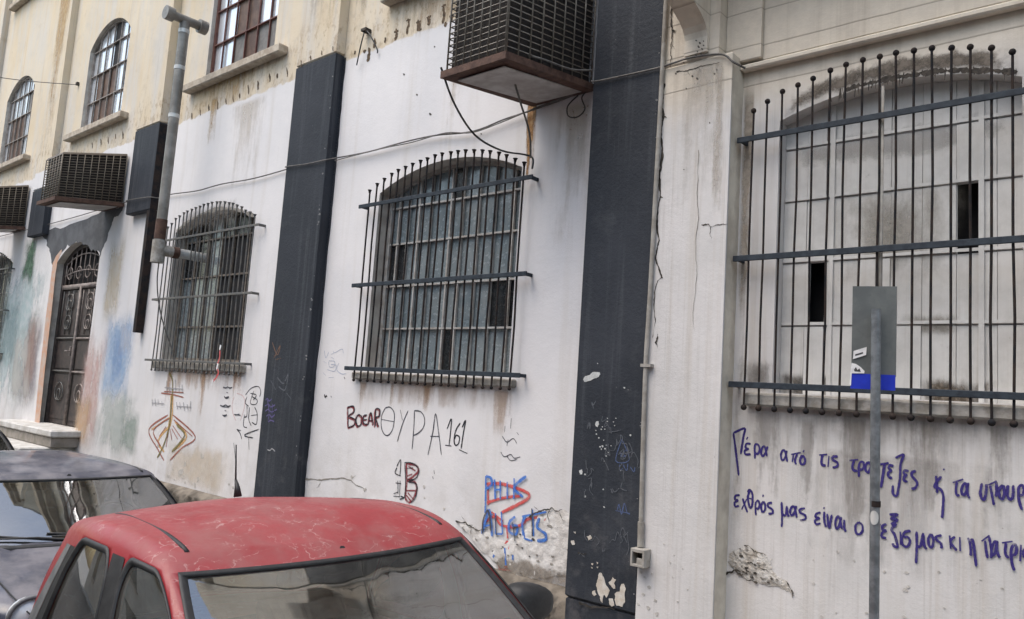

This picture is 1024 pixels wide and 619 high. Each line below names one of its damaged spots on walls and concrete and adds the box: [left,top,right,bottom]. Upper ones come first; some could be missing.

corrosion [526,106,536,175]
crack [652,8,719,344]
crack [693,150,726,331]
crack [305,475,364,489]
flaking render [457,507,592,579]
peeling [591,562,659,616]
flaking render [728,545,794,595]